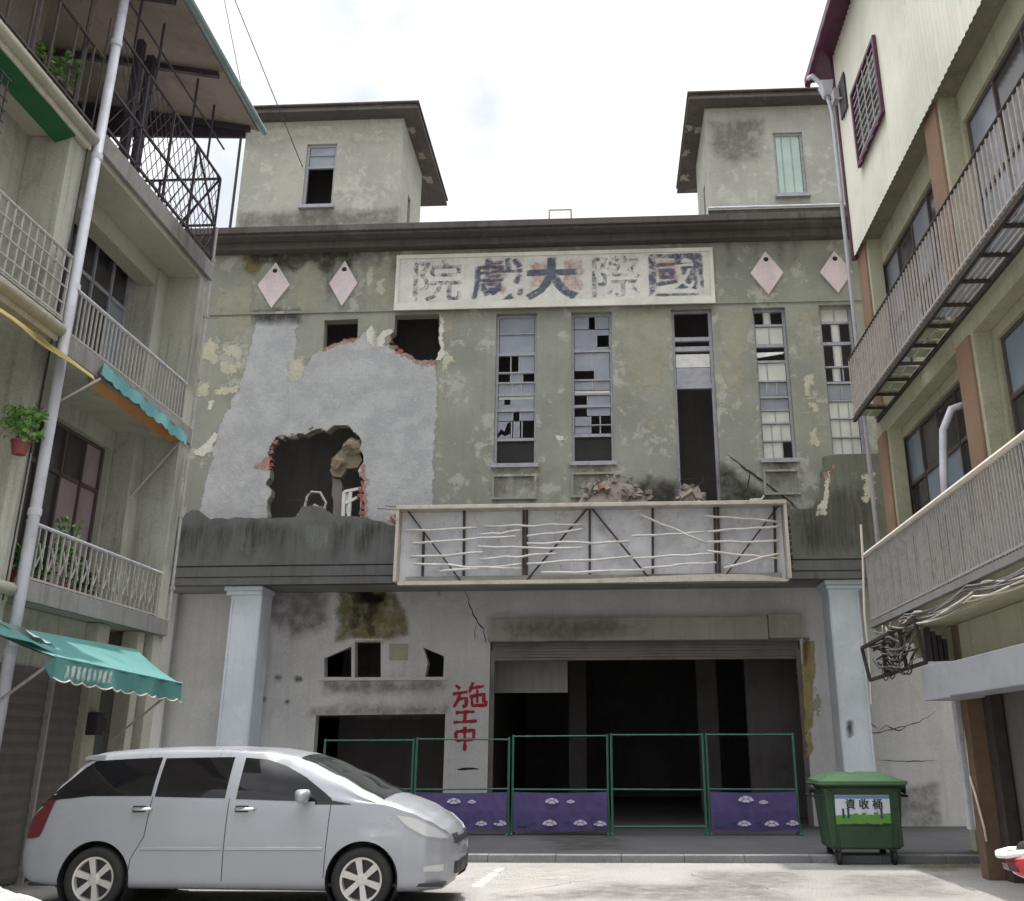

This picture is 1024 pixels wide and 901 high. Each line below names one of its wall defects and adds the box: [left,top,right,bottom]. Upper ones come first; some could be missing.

spalling [194,257,456,523]
peeling [803,374,820,412]
crack [728,455,795,507]
spalling [816,464,835,517]
crack [465,592,486,643]
crack [871,711,936,733]